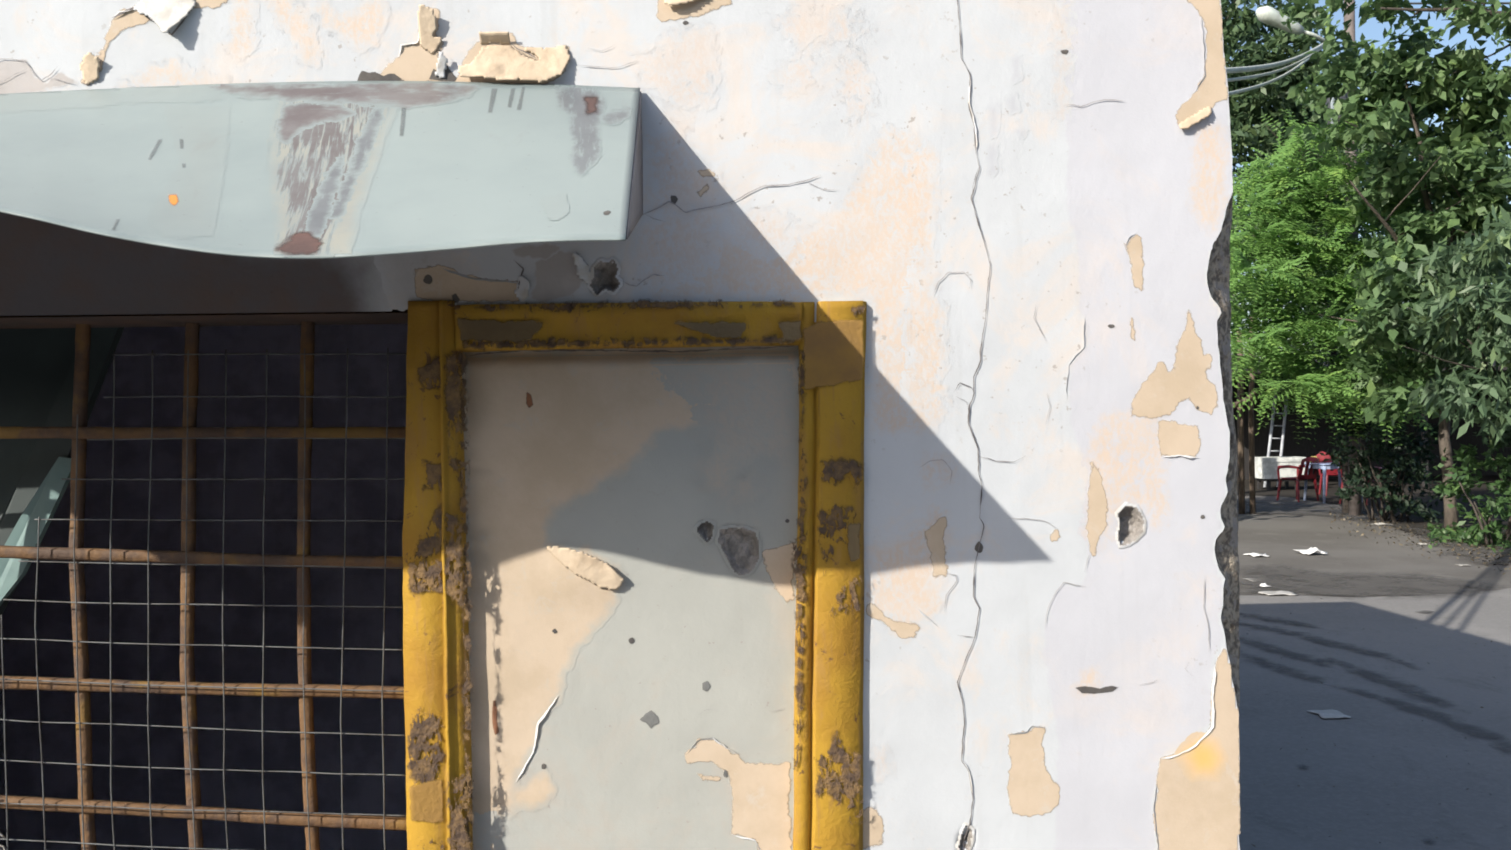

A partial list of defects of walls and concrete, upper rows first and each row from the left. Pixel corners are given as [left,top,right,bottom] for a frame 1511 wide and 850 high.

peeling [380,5,570,84]
rust [0,83,480,316]
crack [643,175,838,222]
crack [924,0,1056,850]
peeling [1047,0,1240,850]
peeling [462,345,799,850]
peeling [1007,726,1060,817]
peeling [863,807,884,849]
spalling [955,823,975,850]